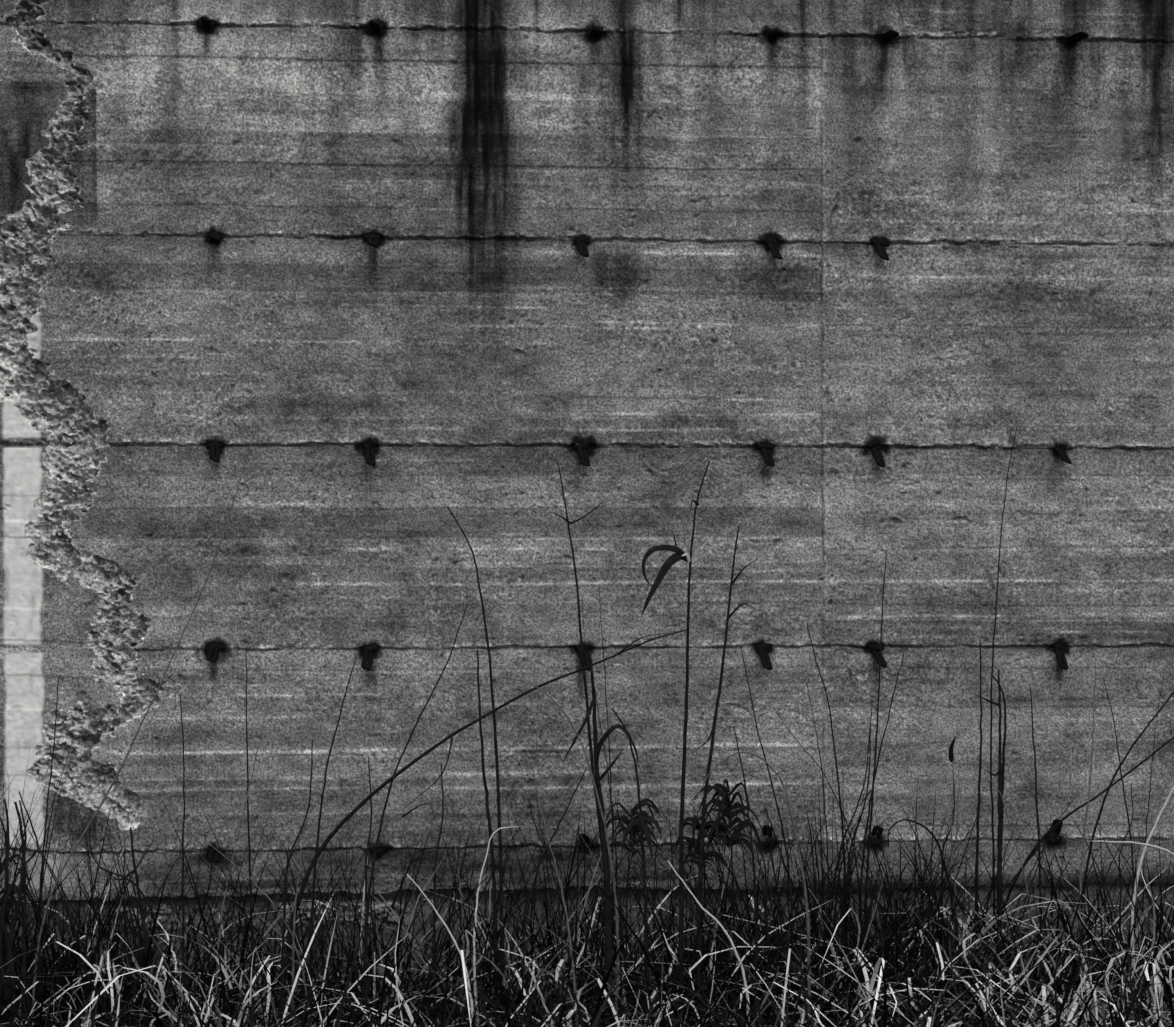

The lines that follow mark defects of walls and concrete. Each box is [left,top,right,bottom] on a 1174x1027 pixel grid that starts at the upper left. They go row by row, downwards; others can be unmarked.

damp [0,117,40,219]
damp [76,89,96,164]
damp [451,0,509,273]
damp [613,0,642,142]
damp [1145,0,1172,154]
spalling [27,690,143,830]